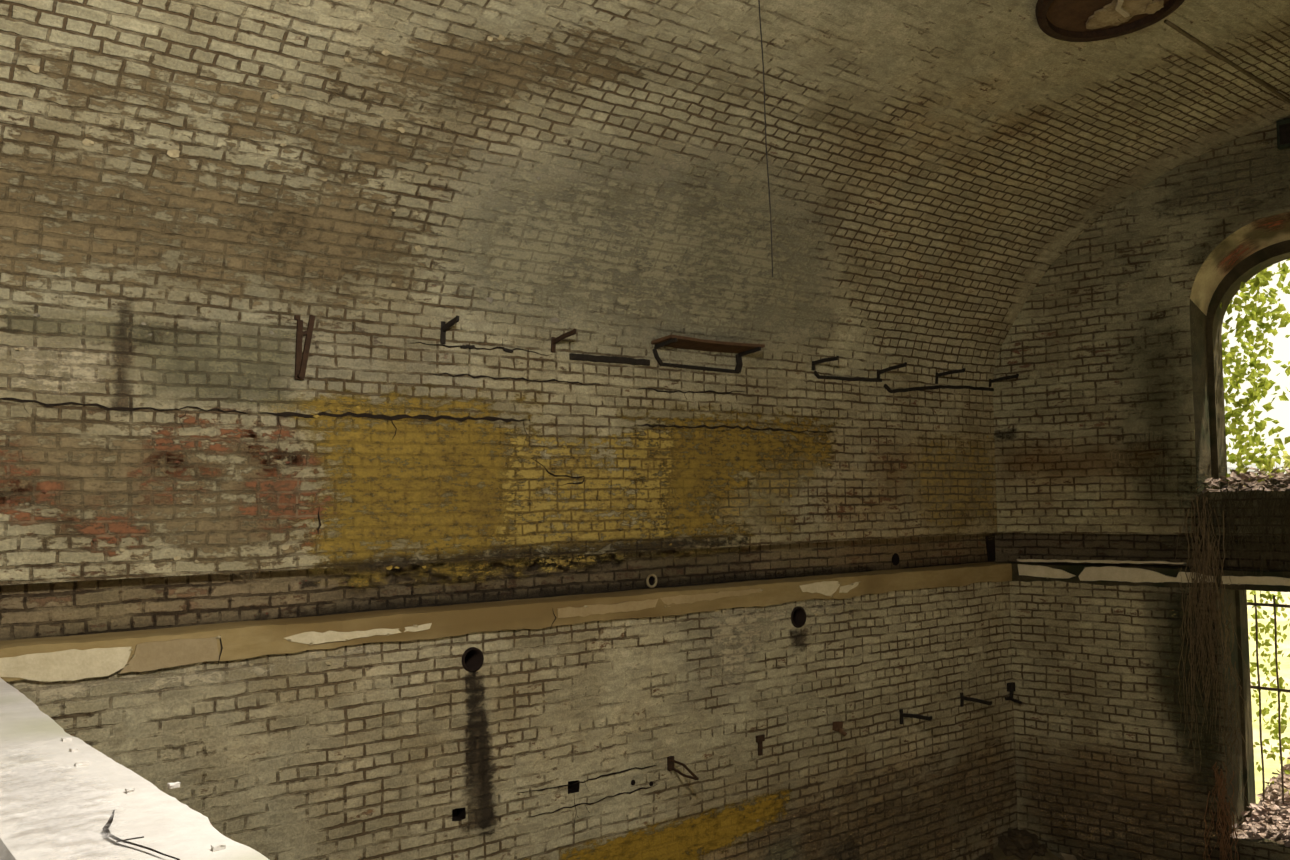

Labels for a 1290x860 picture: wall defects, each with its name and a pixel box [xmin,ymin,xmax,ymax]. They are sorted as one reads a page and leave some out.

crack [416,341,597,385]
crack [0,398,585,486]
peeling [1017,559,1290,586]
peeling [0,635,221,682]
peeling [284,623,432,665]
damp [467,673,494,834]